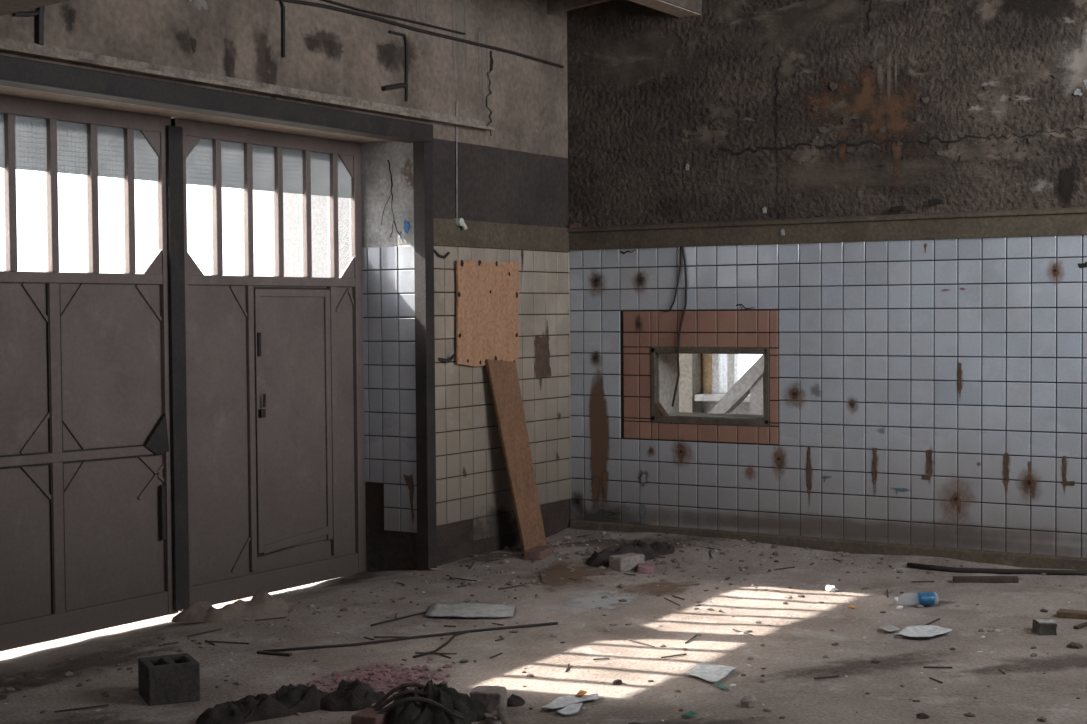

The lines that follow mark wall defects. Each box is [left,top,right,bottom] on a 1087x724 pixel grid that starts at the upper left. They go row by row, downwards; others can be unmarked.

leakage [224,43,235,78]
leakage [256,34,277,99]
leakage [306,32,342,57]
flaking render [1056,30,1087,96]
crack [721,66,1087,219]
corrosion [788,388,802,405]
corrosion [1021,462,1037,497]